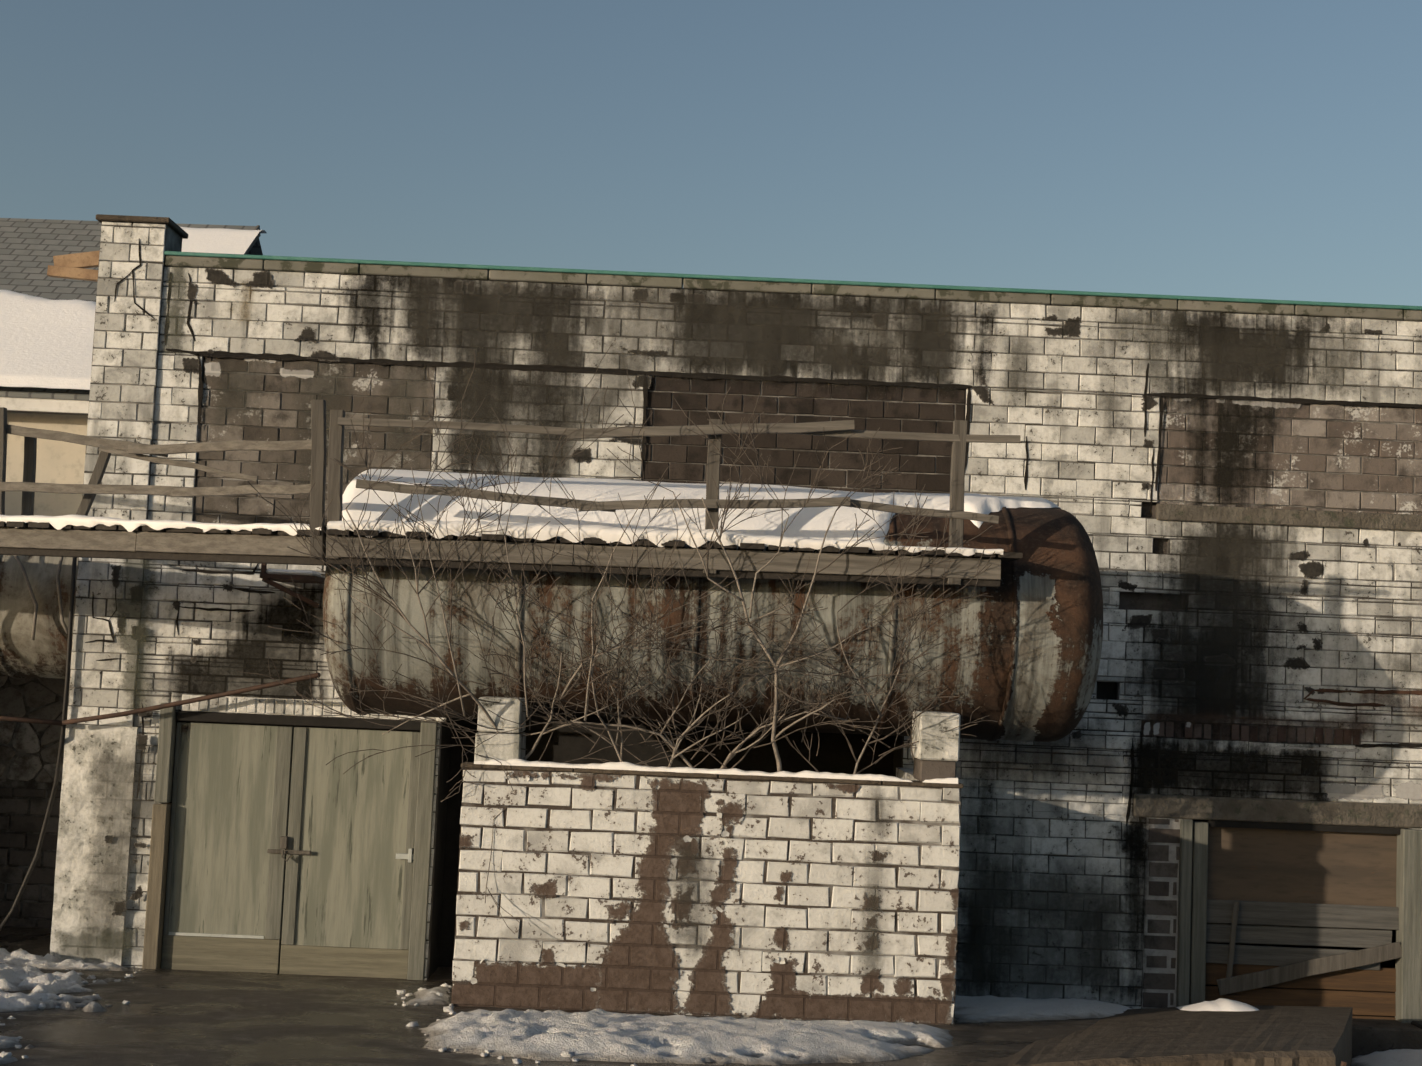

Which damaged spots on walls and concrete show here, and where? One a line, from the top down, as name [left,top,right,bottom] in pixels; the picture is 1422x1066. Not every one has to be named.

crack [114,238,972,469]
water stain [345,275,994,478]
crack [1020,436,1028,490]
peeling [1216,399,1301,409]
water stain [168,585,324,716]
water stain [955,310,1356,998]